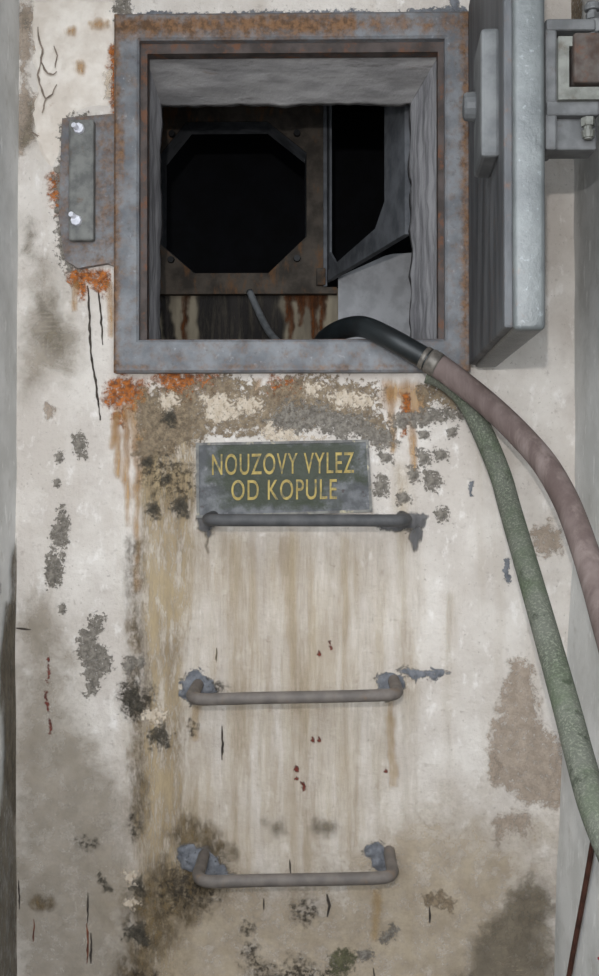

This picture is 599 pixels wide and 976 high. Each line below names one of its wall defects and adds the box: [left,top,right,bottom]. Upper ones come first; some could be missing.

crack [22,27,58,137]
corrosion [66,268,113,333]
crack [87,286,103,420]
corrosion [102,374,229,500]
corrosion [385,384,425,471]
peeling [44,504,71,591]
peeling [75,612,115,699]
damp [0,407,555,976]